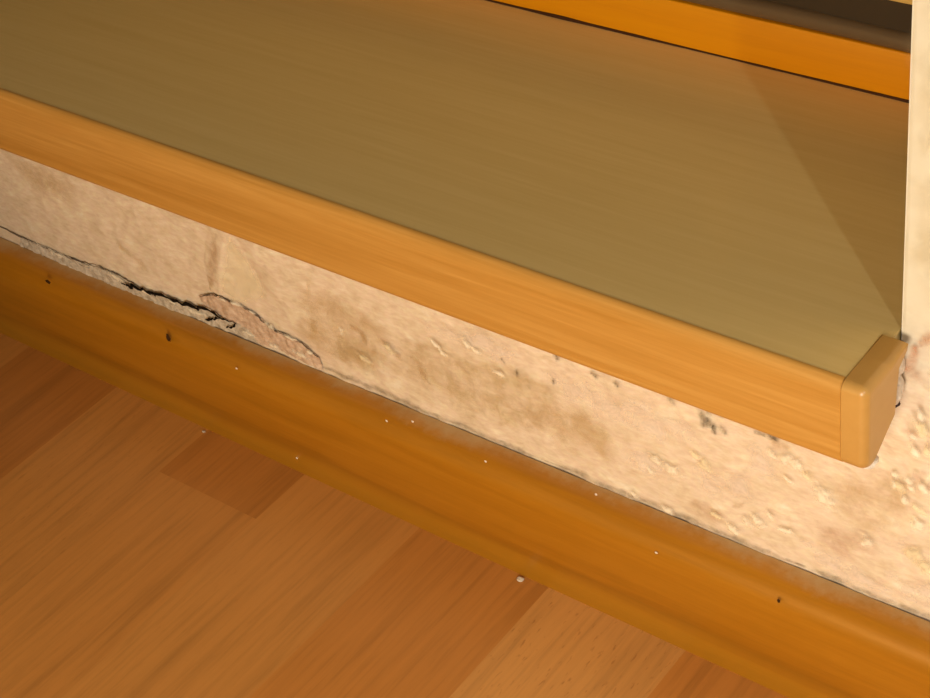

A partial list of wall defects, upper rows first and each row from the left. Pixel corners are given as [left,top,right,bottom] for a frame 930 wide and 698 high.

crack [1,227,236,329]
spalling [20,238,322,370]